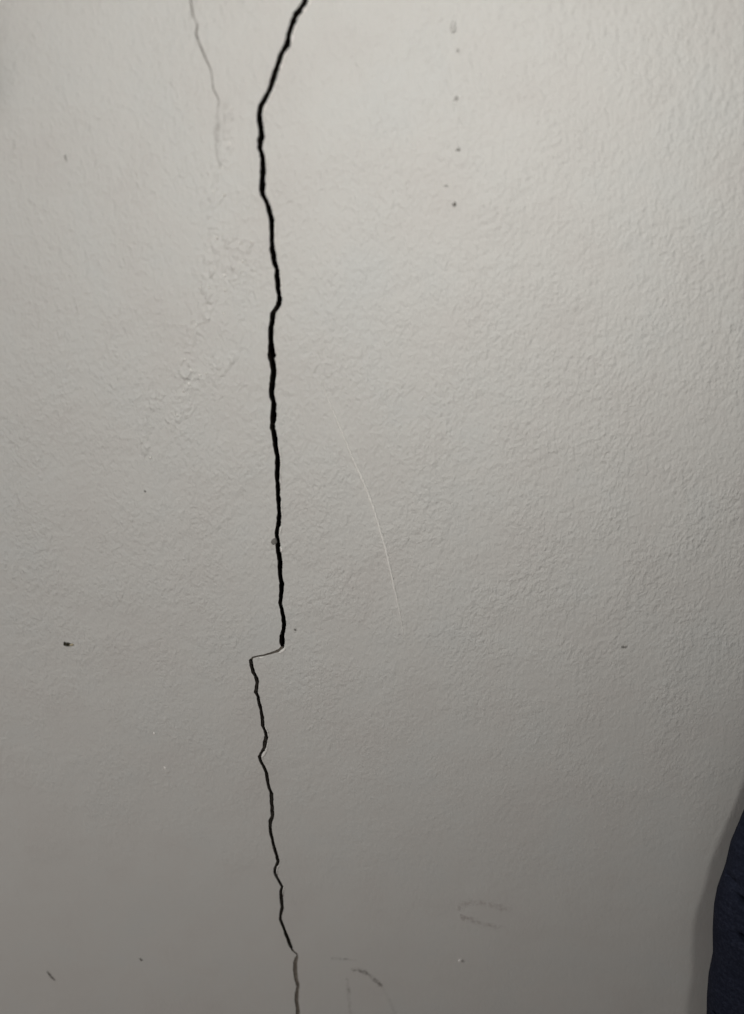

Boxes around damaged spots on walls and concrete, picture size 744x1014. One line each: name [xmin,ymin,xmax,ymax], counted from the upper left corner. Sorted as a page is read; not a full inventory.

crack [249,0,312,1014]